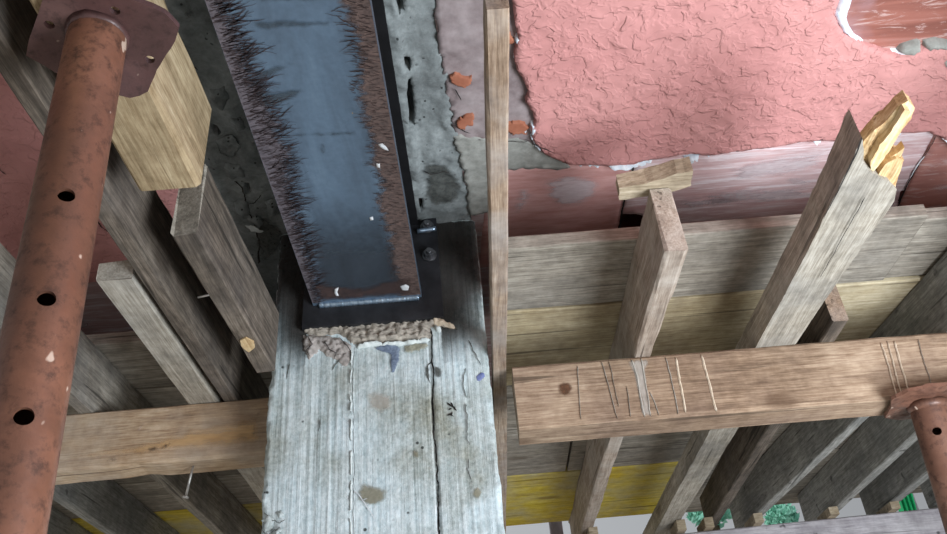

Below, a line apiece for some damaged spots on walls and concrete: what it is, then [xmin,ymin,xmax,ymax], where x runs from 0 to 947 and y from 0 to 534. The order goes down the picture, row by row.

corrosion [205,0,421,303]
water stain [426,165,461,204]
flaking render [434,0,489,267]
flaking render [508,0,835,237]
flaking render [835,0,947,67]
flaking render [891,132,947,208]
spalling [303,318,455,366]
crack [427,329,440,534]